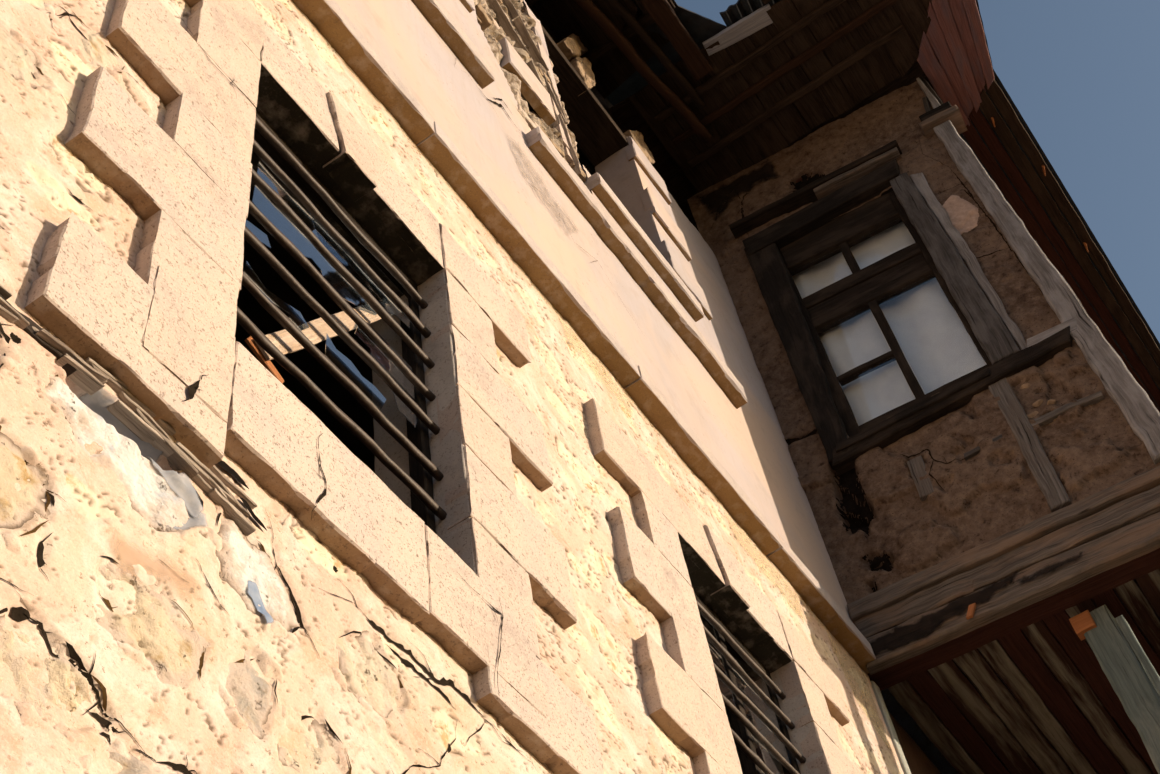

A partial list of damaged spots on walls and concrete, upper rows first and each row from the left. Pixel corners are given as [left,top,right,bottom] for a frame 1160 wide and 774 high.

crack [311,433,327,520]
spalling [833,461,874,538]
crack [873,434,992,490]
crack [266,512,320,658]
spalling [862,550,893,592]
crack [0,489,197,774]
crack [324,572,536,774]